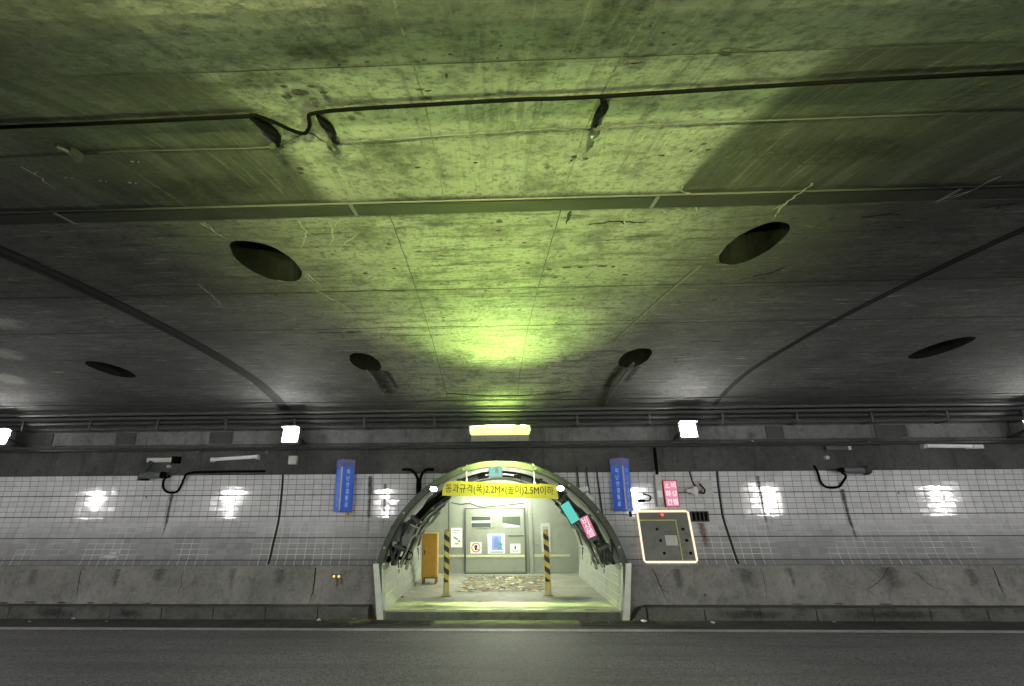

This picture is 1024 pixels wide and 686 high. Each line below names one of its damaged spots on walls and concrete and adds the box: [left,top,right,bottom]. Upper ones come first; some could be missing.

crack [566,186,698,227]
crack [770,183,813,217]